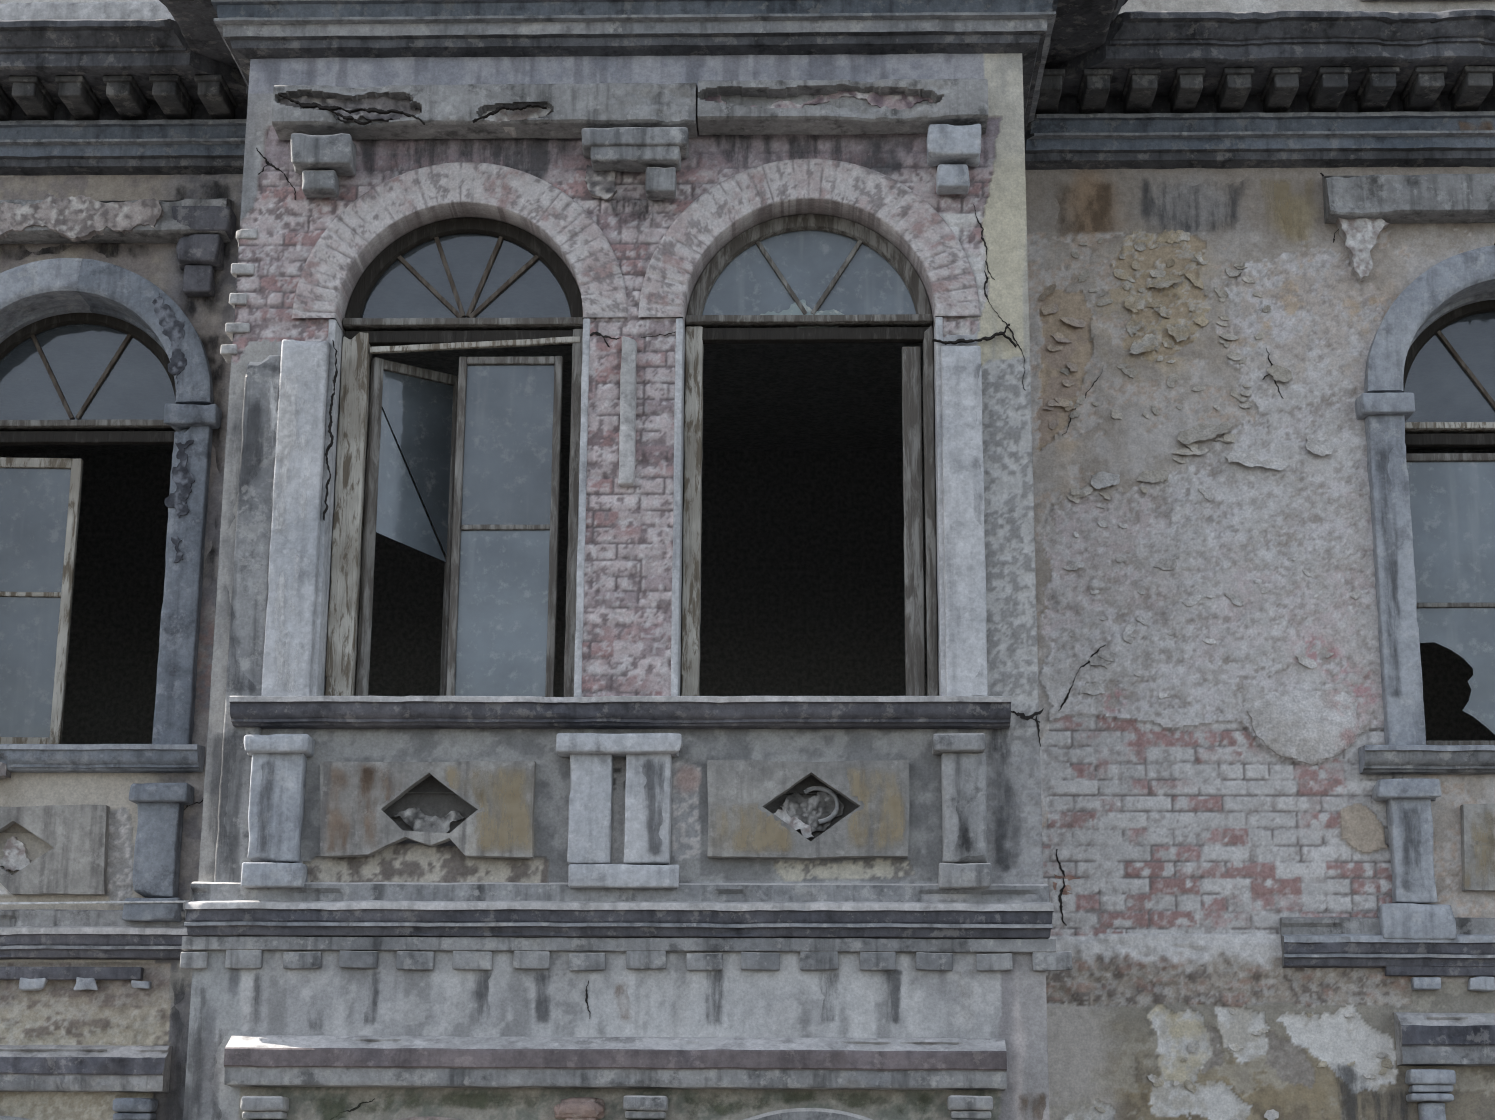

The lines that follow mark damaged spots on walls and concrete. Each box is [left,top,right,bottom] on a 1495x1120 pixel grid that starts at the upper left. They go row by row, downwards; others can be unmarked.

crack [256,148,296,200]
spalling [750,91,934,110]
crack [932,204,1025,390]
flaking render [220,96,1003,697]
crack [1011,644,1106,747]
flaking render [1036,217,1414,1120]